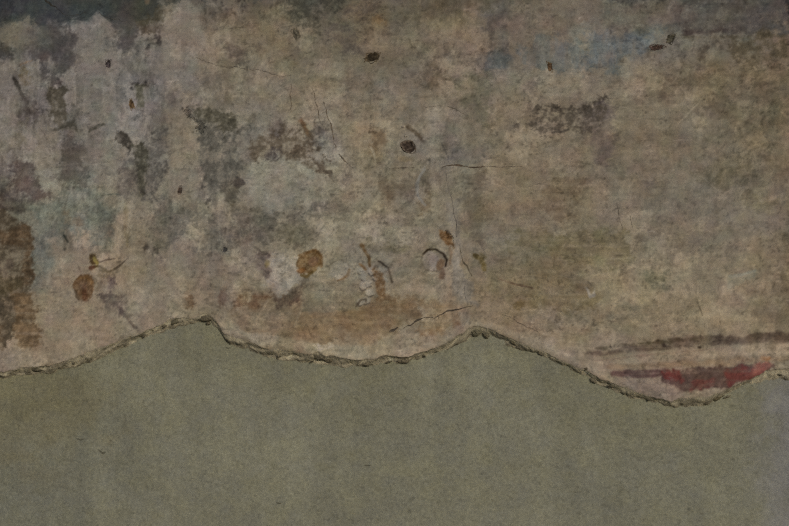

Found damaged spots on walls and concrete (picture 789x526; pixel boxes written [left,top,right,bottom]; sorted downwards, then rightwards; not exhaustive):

crack [389,164,522,332]
spalling [0,313,789,408]